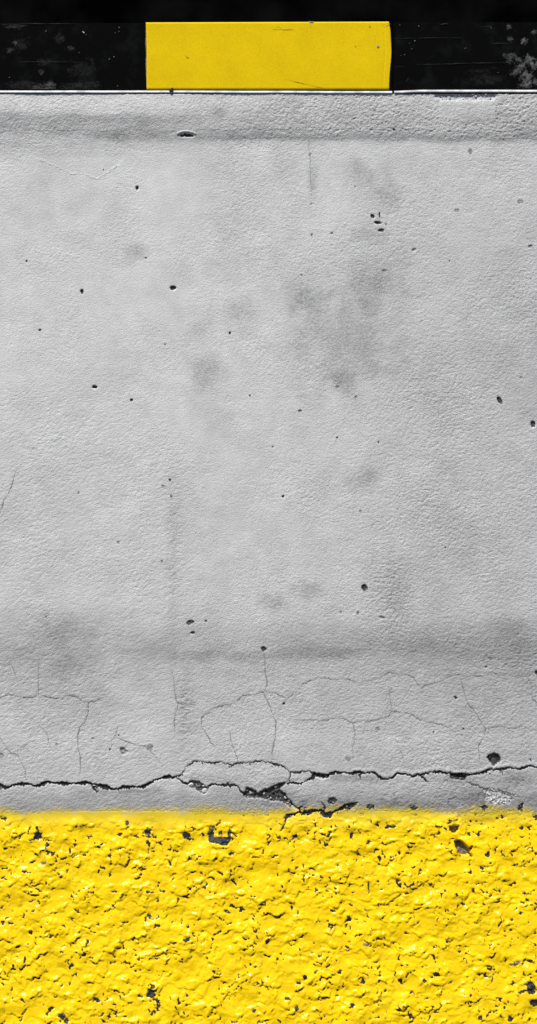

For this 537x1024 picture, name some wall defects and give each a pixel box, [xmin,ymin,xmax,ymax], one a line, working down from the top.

crack [0,647,537,831]